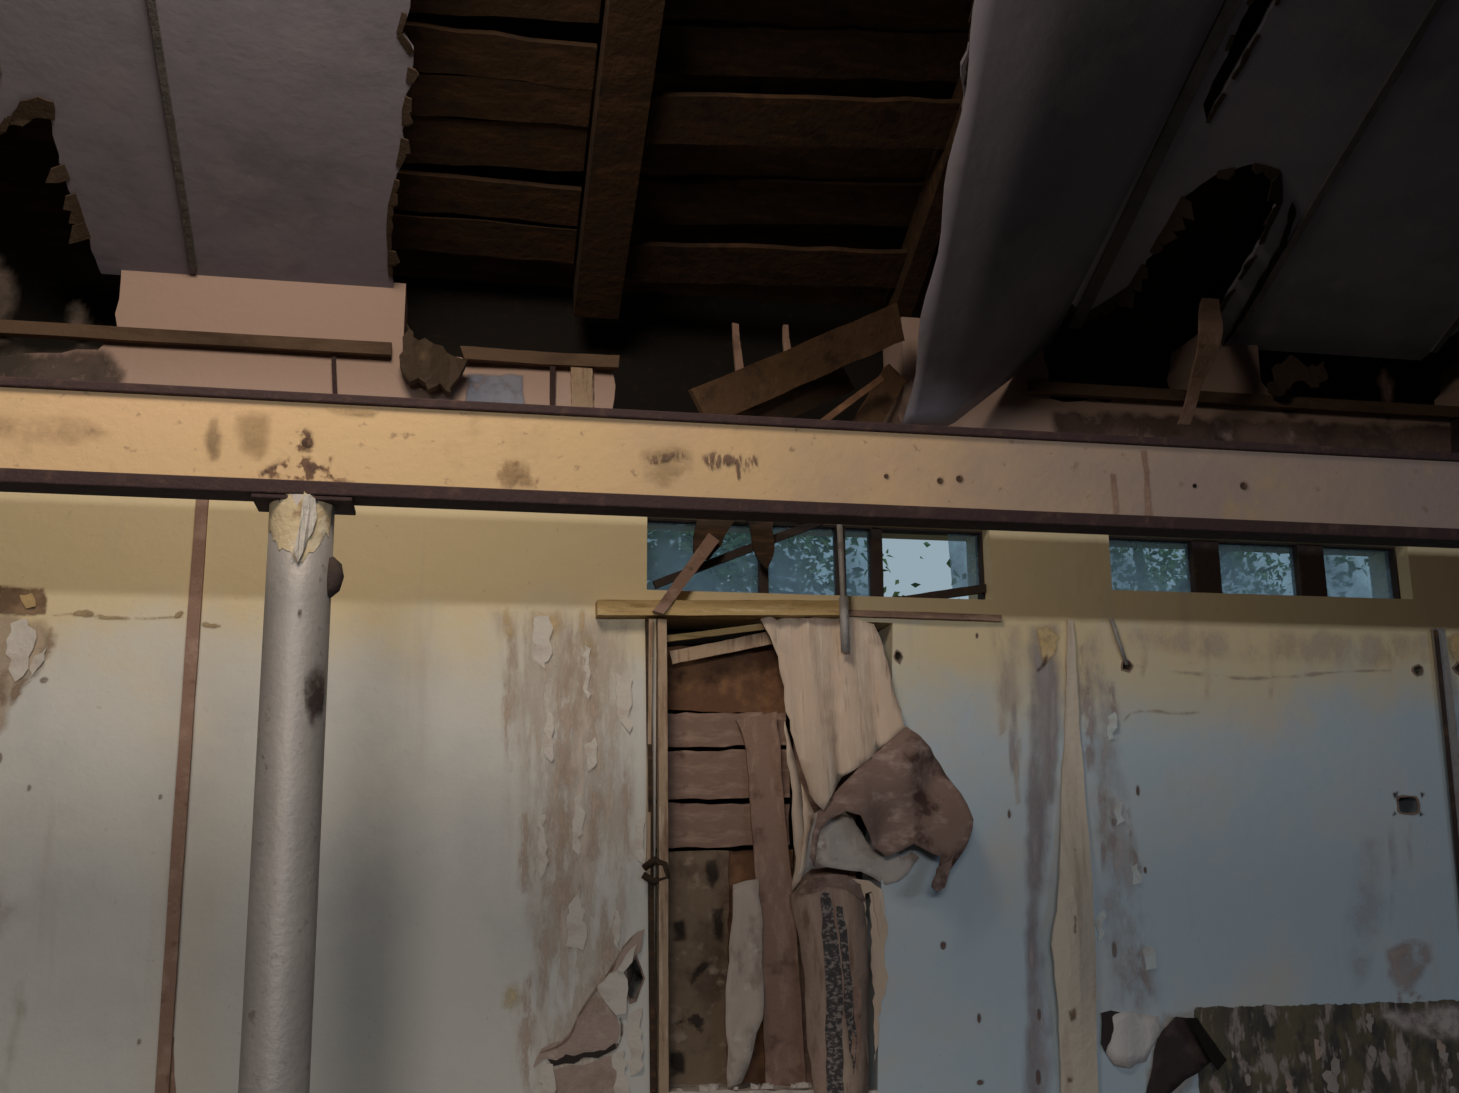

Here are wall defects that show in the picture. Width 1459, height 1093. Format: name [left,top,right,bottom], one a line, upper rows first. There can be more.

peeling [0,115,32,135]
peeling [1217,163,1283,245]
peeling [1098,197,1194,316]
rust [261,430,342,482]
peeling [268,491,332,563]
flaking render [0,586,53,728]
leakage [1001,645,1057,889]
flaking render [533,929,645,1093]
peeling [1146,999,1459,1093]